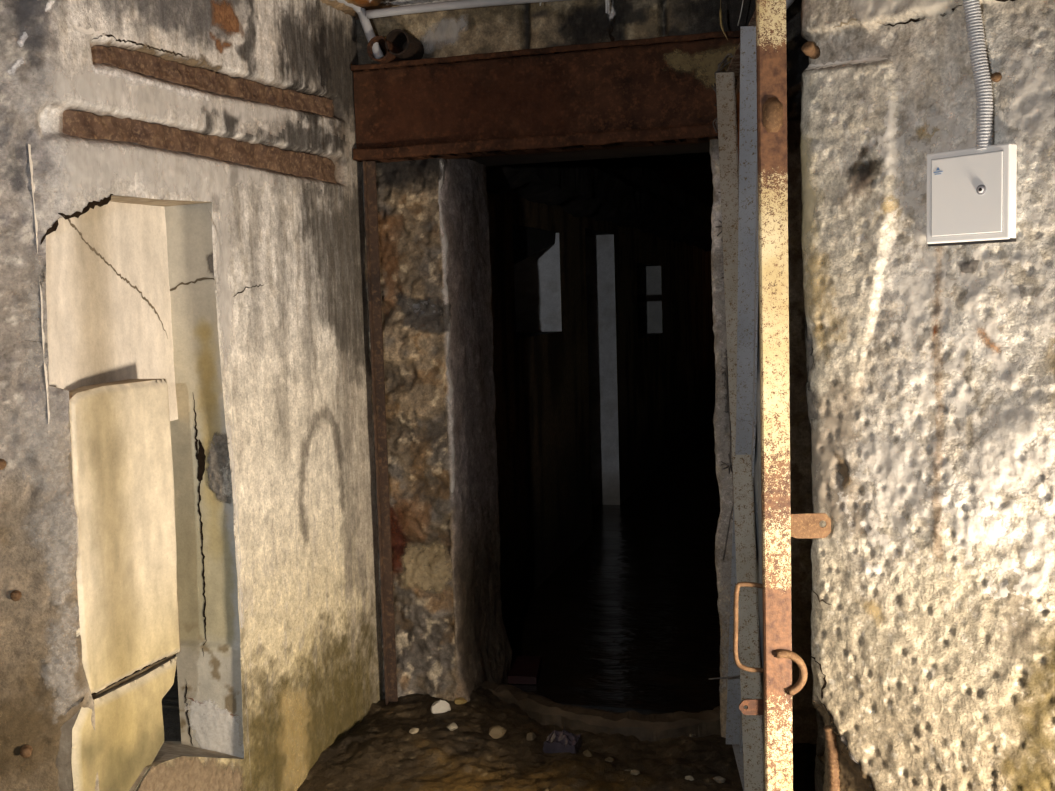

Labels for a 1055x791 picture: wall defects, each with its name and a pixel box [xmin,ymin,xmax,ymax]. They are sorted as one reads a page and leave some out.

leakage [8,0,60,73]
leakage [106,0,256,78]
spalling [125,1,243,72]
crack [833,5,962,28]
leakage [225,2,358,155]
leakage [848,148,881,203]
crack [39,194,263,338]
spalling [206,433,232,503]
crack [64,395,207,715]
spalling [812,698,874,791]